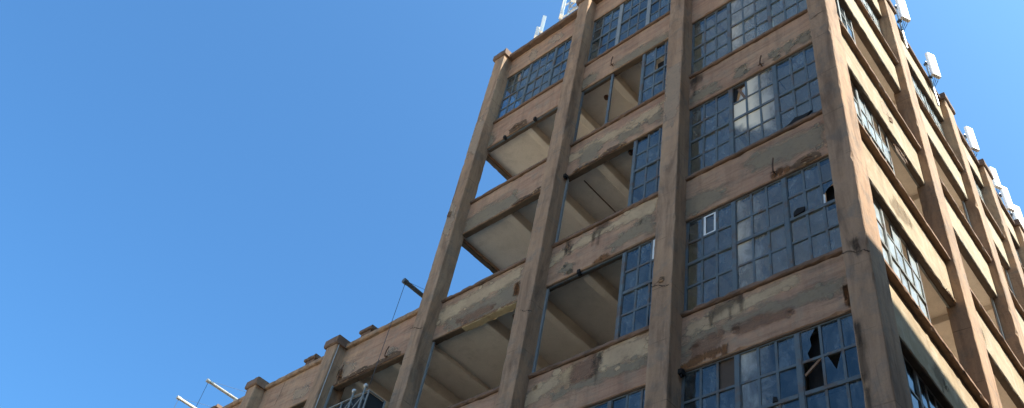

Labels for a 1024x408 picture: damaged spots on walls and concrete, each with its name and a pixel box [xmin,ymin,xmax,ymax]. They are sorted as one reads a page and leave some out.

peeling [549,198,658,275]
peeling [436,268,523,332]
peeling [524,360,579,407]
peeling [596,331,649,372]